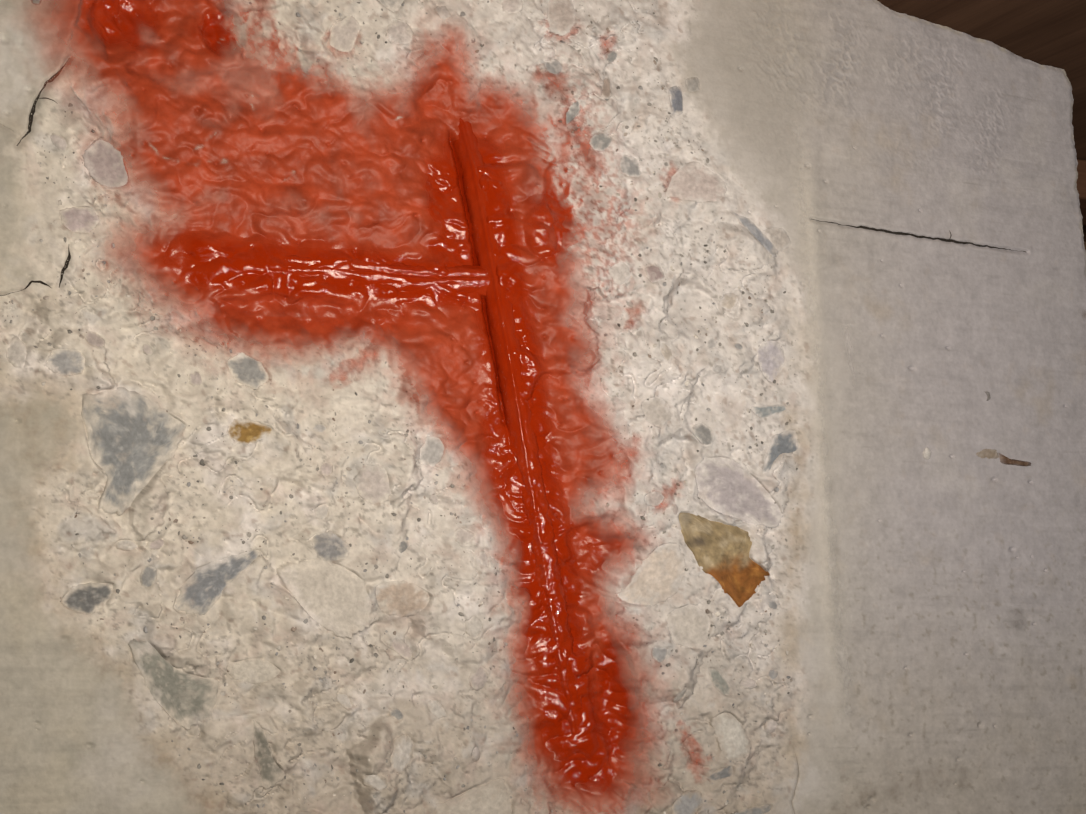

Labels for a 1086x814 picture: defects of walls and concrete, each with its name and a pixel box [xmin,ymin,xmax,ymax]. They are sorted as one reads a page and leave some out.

crack [1,57,70,146]
crack [0,247,71,296]
crack [812,219,1026,252]
spalling [0,0,812,814]